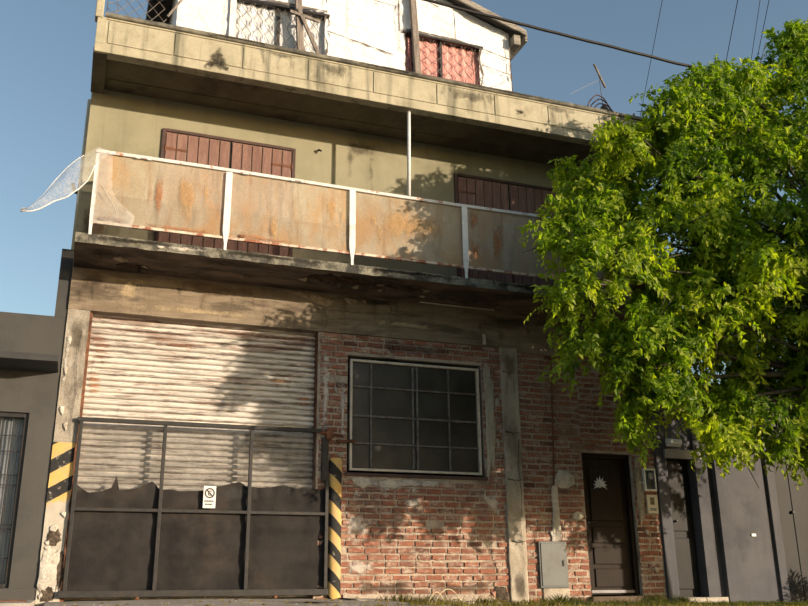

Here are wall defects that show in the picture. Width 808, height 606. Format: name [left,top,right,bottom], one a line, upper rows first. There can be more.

mould [207,51,228,70]
peeling [37,524,64,602]